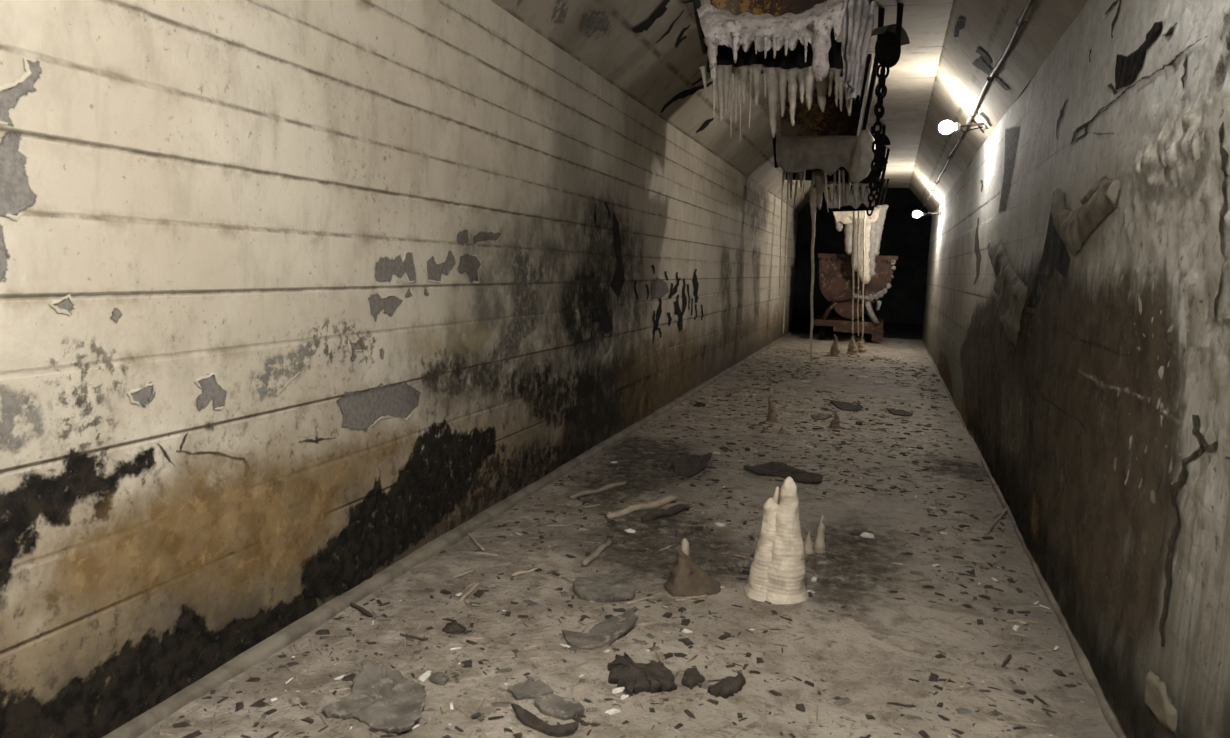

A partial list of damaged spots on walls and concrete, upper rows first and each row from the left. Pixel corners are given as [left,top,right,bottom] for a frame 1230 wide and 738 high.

spalling [1115,21,1173,89]
peeling [0,57,42,283]
peeling [366,230,501,325]
water stain [0,215,703,738]
peeling [337,383,421,431]
water stain [960,254,1186,738]